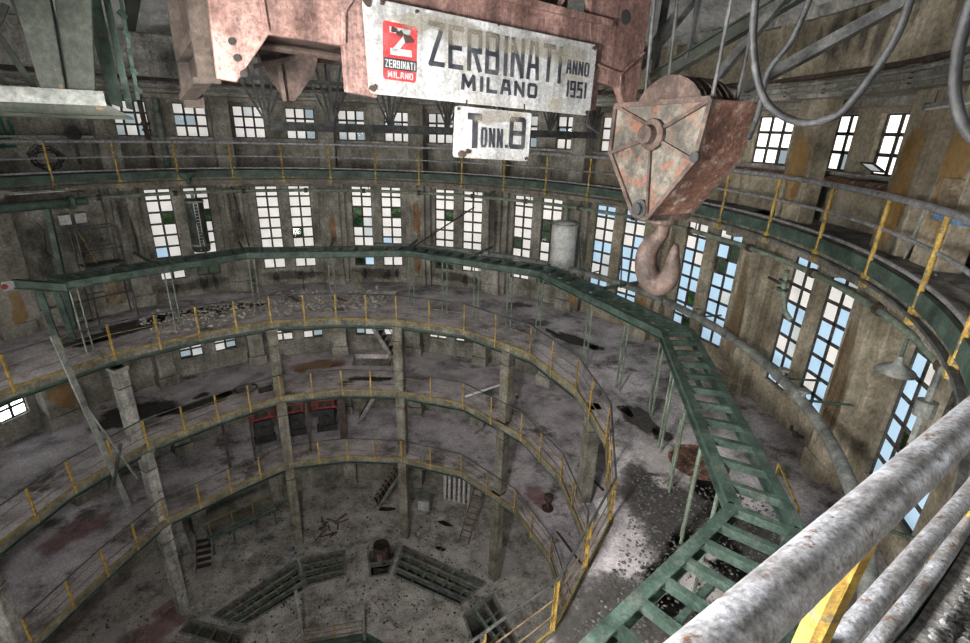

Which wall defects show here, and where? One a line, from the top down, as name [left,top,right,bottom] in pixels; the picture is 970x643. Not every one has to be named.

damp [545,328,605,350]
damp [553,405,724,643]
damp [734,507,781,545]
damp [716,535,770,564]
damp [698,553,748,583]